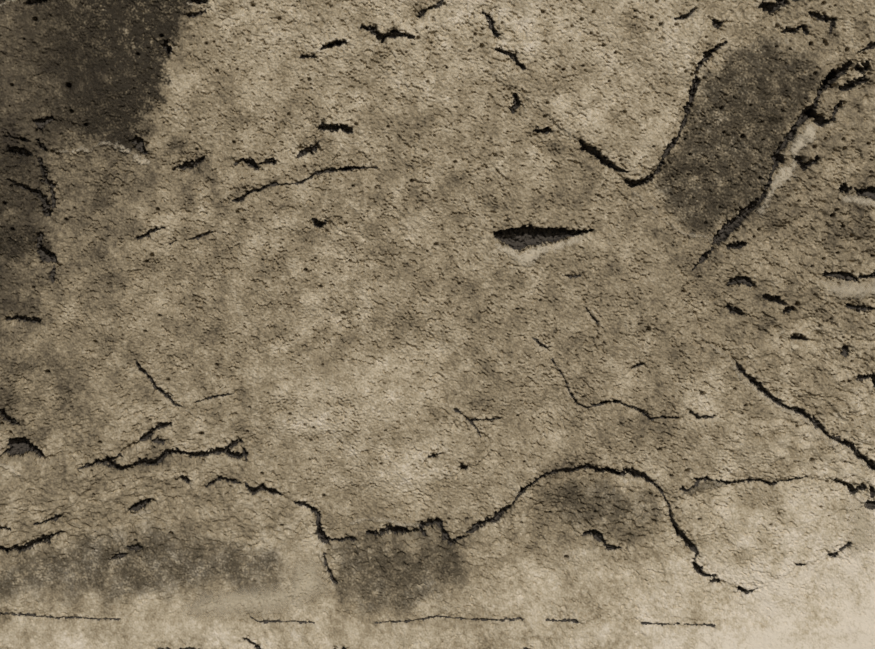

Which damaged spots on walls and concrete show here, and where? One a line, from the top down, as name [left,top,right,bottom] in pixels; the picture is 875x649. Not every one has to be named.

crack [187,0,207,18]
crack [579,41,727,188]
damp [662,40,819,231]
crack [691,42,875,272]
spalling [493,224,594,267]
crack [734,359,875,498]
crack [77,358,808,584]
crack [0,514,64,555]
crack [0,612,120,621]
crack [244,617,315,649]
crack [375,615,523,624]
crack [641,620,716,628]